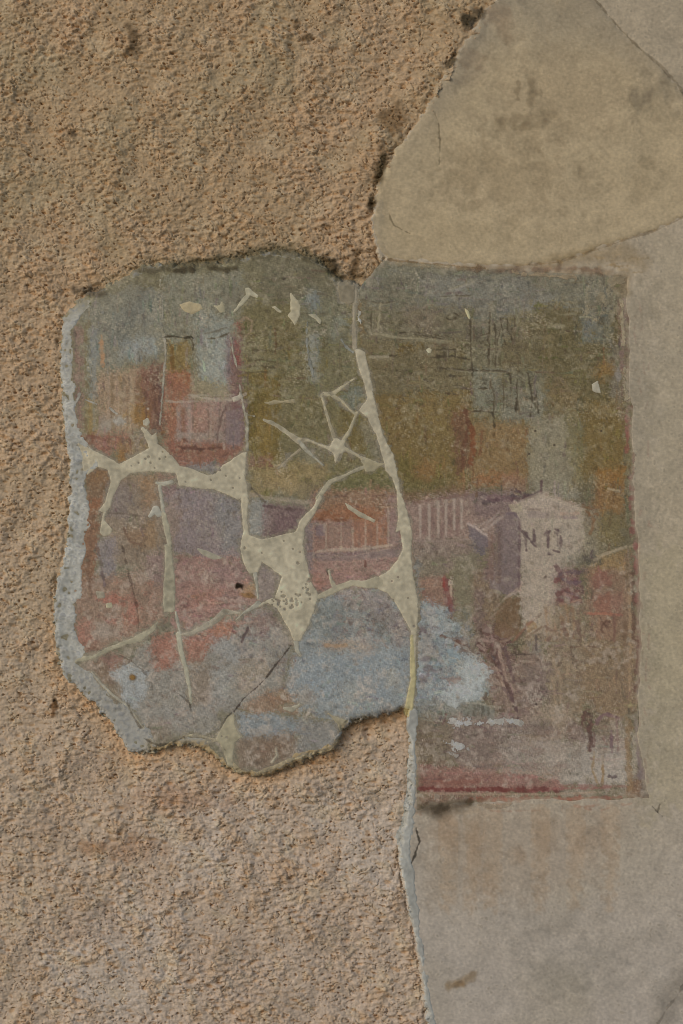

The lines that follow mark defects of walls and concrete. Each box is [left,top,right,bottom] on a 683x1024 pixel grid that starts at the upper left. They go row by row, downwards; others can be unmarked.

peeling [180,288,258,314]
peeling [272,293,321,325]
crack [156,279,192,425]
crack [229,337,255,451]
crack [234,648,289,712]